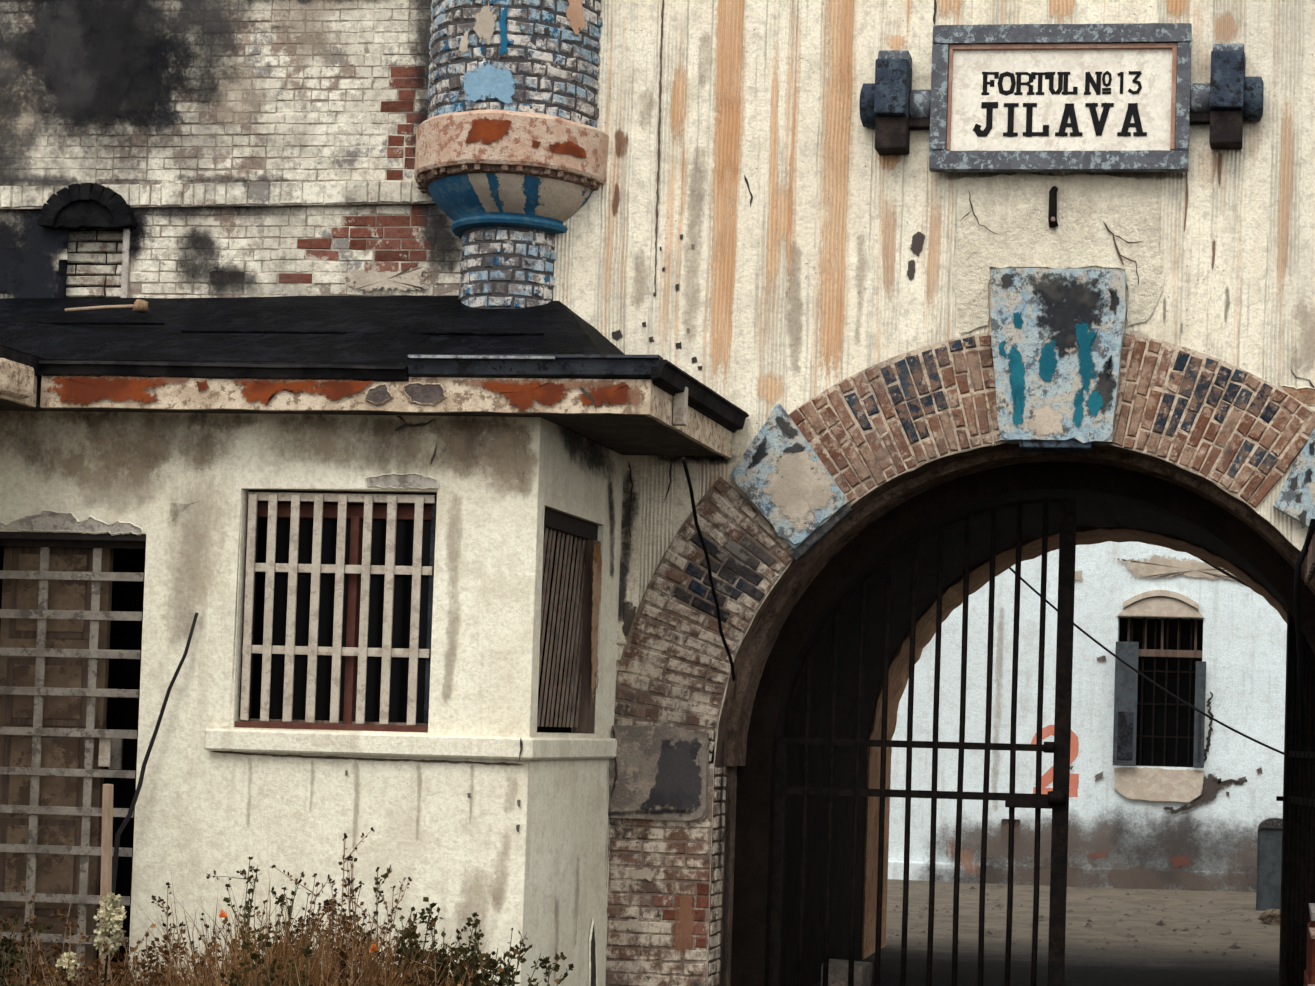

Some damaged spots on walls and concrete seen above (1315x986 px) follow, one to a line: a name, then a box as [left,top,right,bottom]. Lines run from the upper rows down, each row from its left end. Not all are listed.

peeling [459,4,517,145]
flaking render [380,67,424,180]
damp [1,174,77,186]
damp [177,174,288,183]
flaking render [279,205,434,292]
crack [1103,221,1143,284]
peeling [47,376,166,405]
spalling [241,380,446,407]
peeling [998,272,1120,437]
peeling [1289,441,1315,529]
peeling [640,735,702,816]
spalling [1190,767,1263,807]